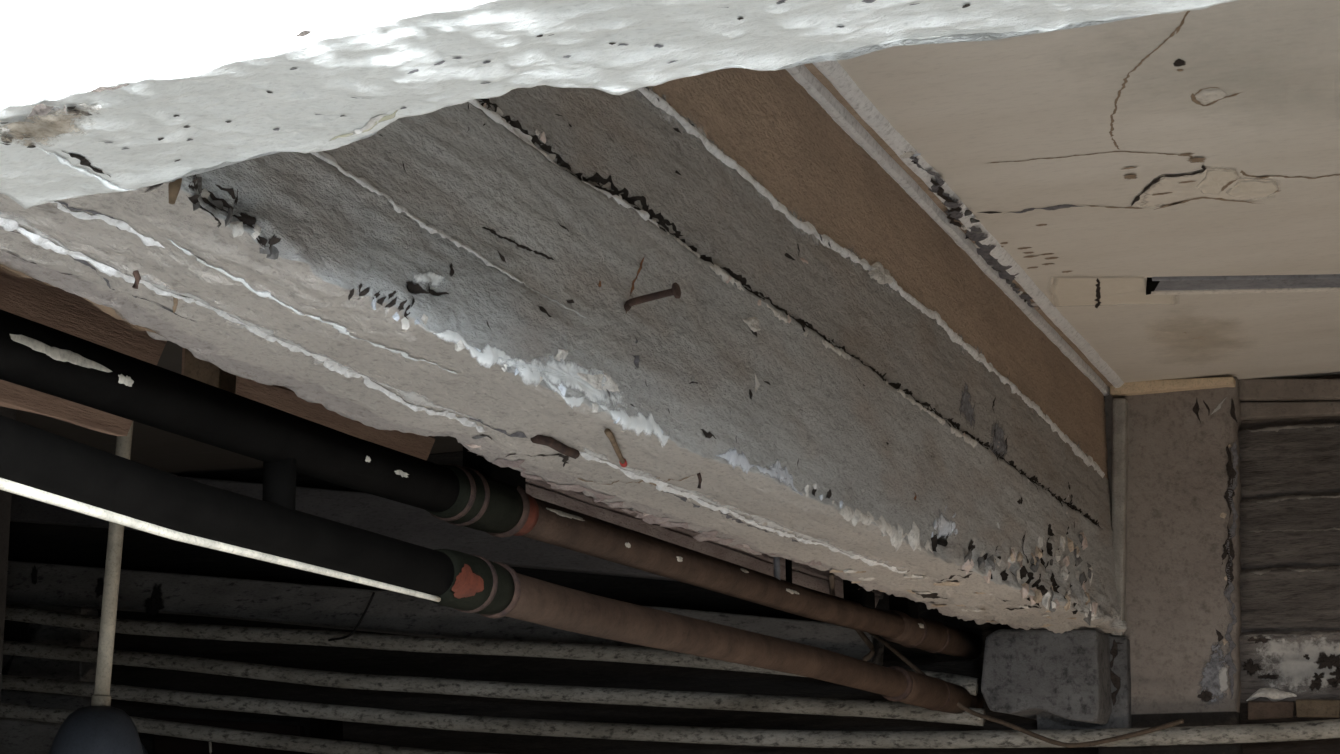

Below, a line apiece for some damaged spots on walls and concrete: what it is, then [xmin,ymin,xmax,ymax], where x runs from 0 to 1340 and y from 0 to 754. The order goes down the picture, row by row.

crack [991,11,1193,163]
crack [1191,87,1242,106]
spalling [186,175,281,260]
crack [930,178,1143,228]
peeling [1124,158,1279,210]
crack [1240,170,1340,179]
peeling [348,263,670,446]
crack [470,98,1102,528]
spalling [530,435,580,459]
spalling [493,458,886,593]
spalling [839,482,1098,627]
peeling [1193,397,1340,720]